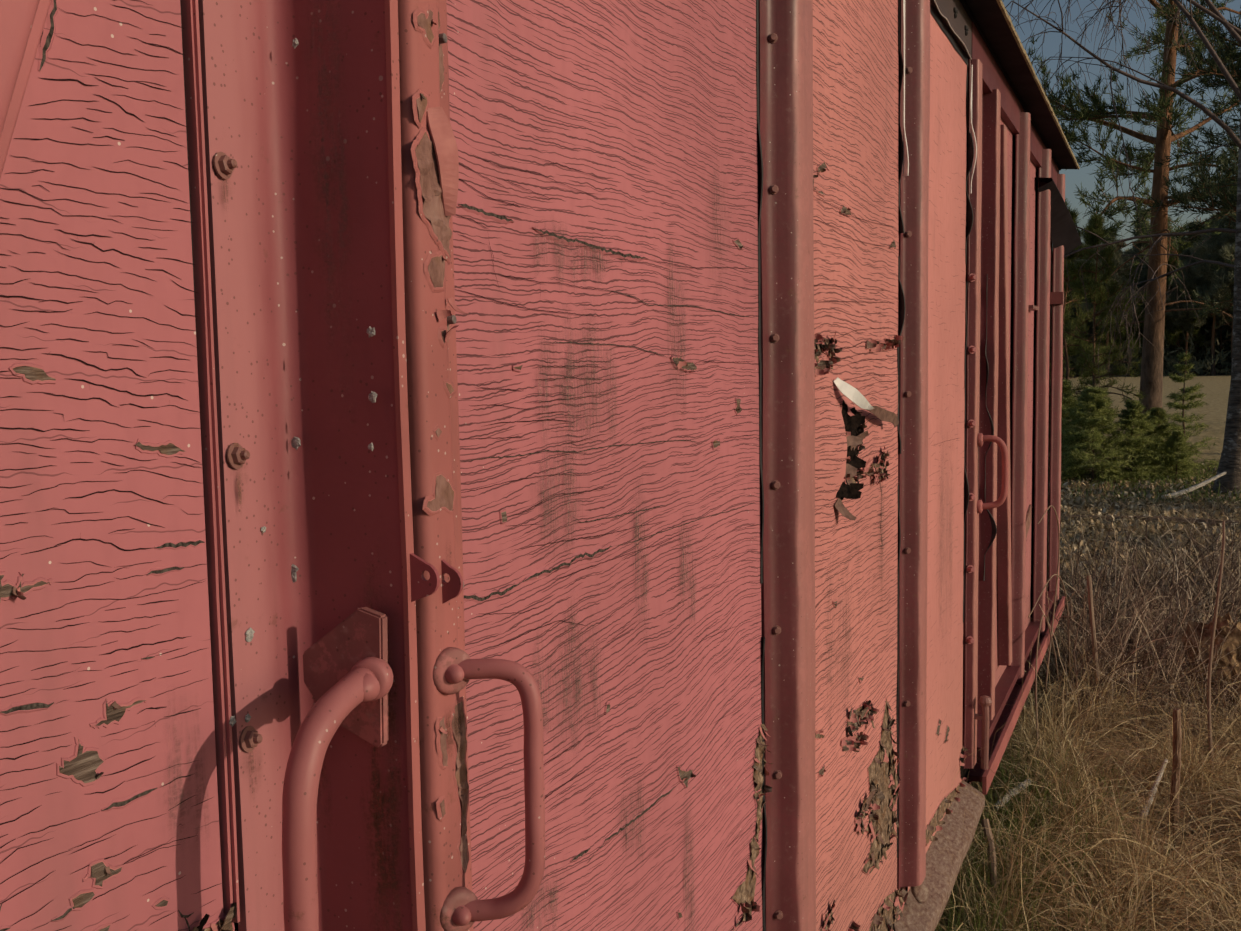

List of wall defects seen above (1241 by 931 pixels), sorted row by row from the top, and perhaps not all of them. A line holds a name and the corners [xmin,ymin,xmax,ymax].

peeling [411,5,469,349]
crack [813,196,894,247]
crack [0,0,219,931]
crack [455,154,759,647]
crack [815,450,893,606]
crack [815,285,897,399]
peeling [435,691,469,877]
crack [570,785,676,862]
peeling [753,724,773,809]
peeling [841,700,901,870]
peeling [735,900,760,928]
peeling [849,889,908,931]